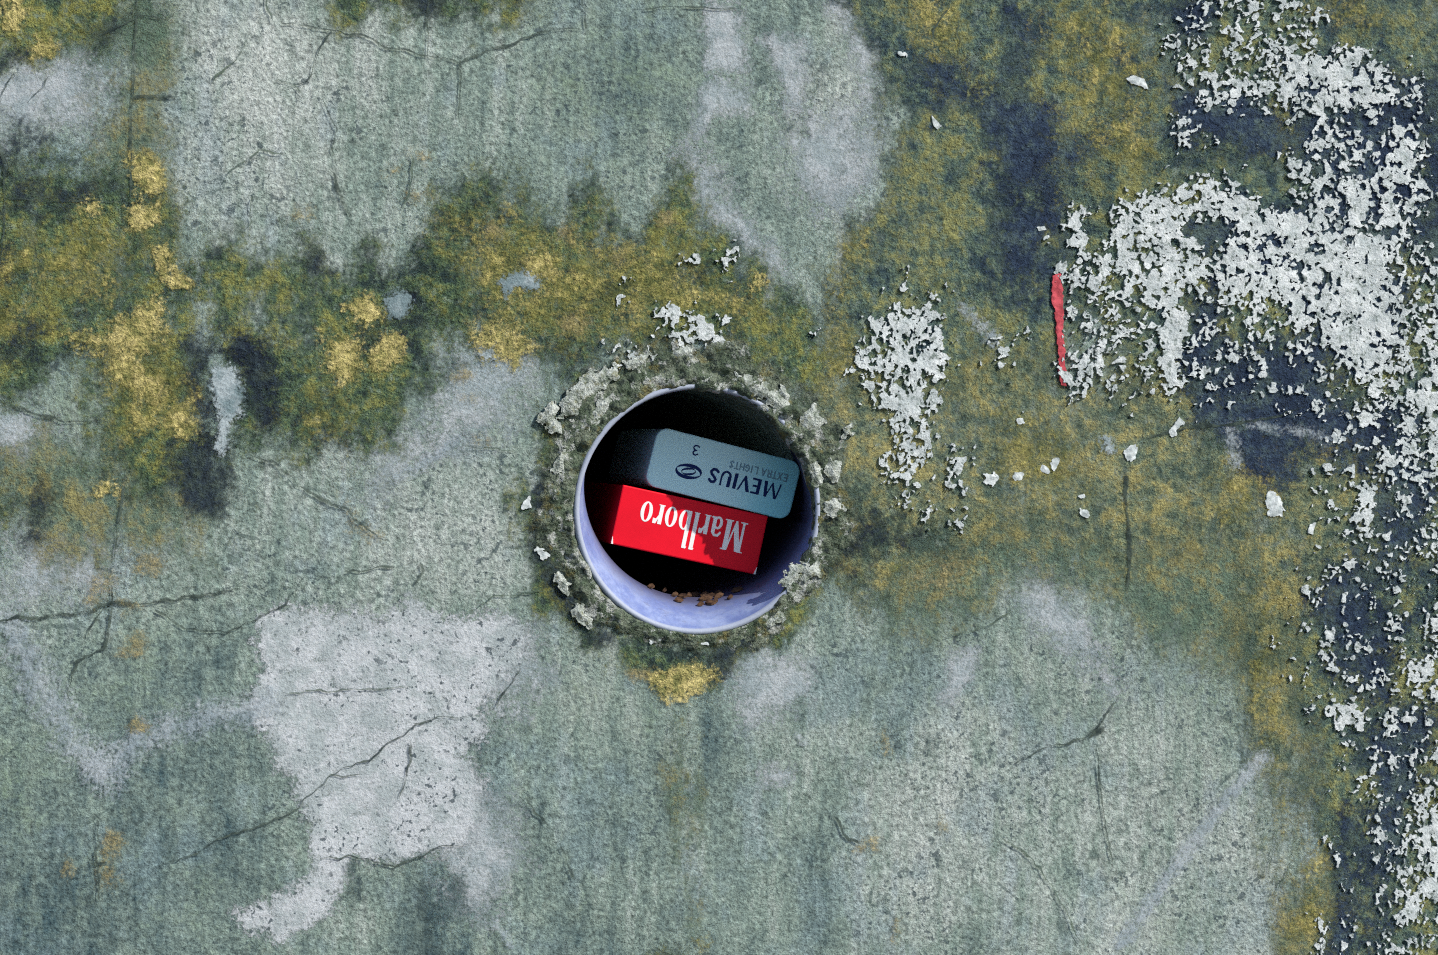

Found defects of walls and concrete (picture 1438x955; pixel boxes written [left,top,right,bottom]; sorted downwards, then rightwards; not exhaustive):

damp [0,12,133,149]
crack [211,41,246,84]
crack [266,0,587,213]
damp [771,0,890,226]
damp [0,403,69,463]
damp [354,330,551,508]
peeling [835,259,1060,534]
peeling [1037,0,1438,955]
crack [0,476,302,698]
crack [288,686,405,694]
crack [164,716,457,864]
crack [331,844,467,867]